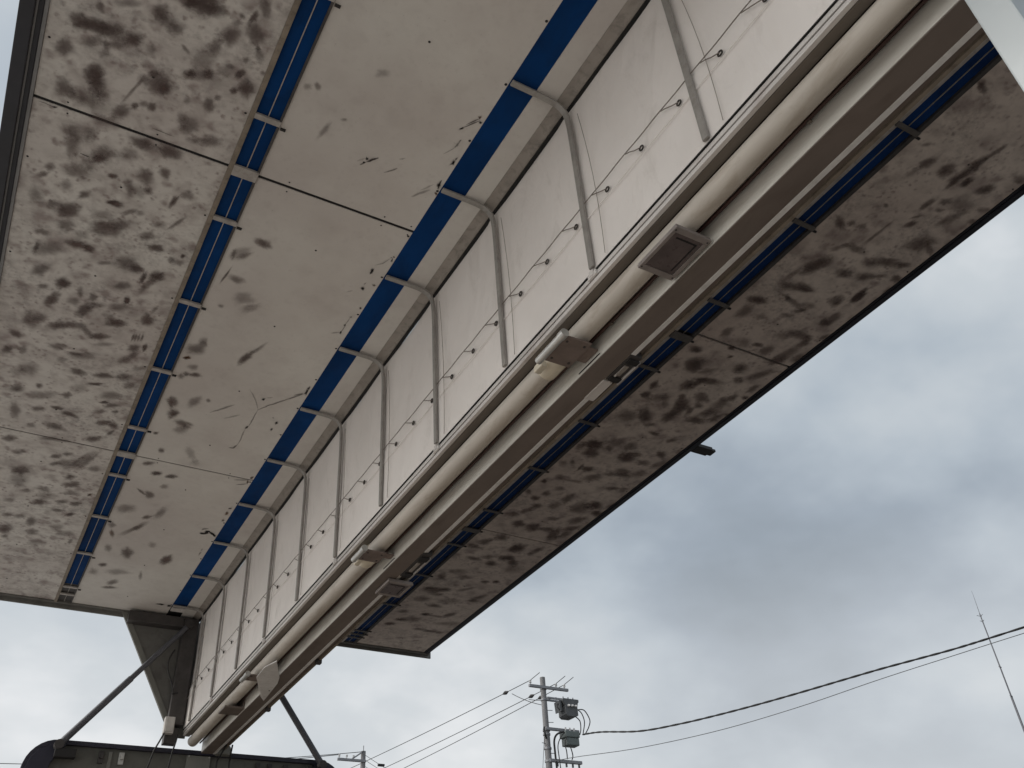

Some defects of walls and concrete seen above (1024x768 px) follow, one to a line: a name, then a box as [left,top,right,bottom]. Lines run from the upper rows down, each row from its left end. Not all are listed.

leakage [187,0,218,14]
leakage [73,15,141,46]
leakage [87,65,104,92]
leakage [231,71,253,94]
leakage [135,139,179,158]
leakage [920,148,1002,184]
leakage [68,241,94,252]
leakage [45,279,70,304]
leakage [91,320,124,339]
leakage [129,315,153,352]
leakage [168,398,188,427]
leakage [664,379,729,423]